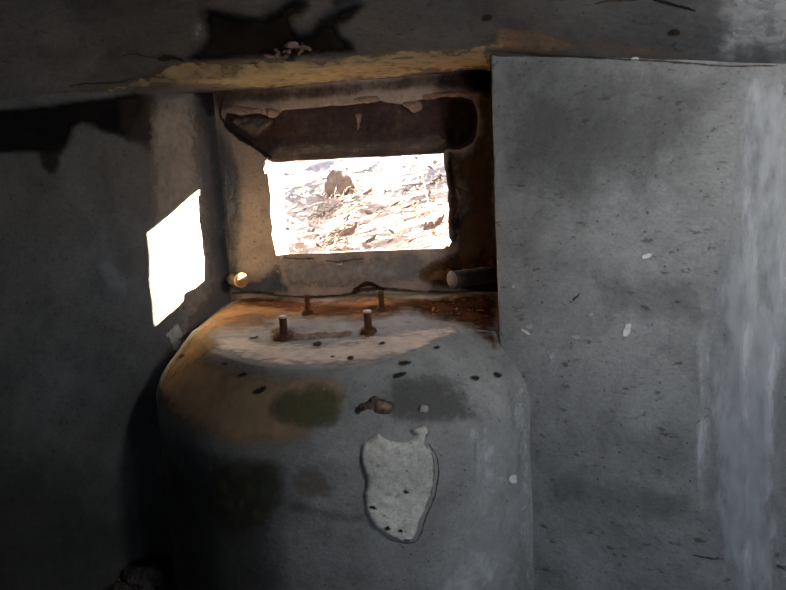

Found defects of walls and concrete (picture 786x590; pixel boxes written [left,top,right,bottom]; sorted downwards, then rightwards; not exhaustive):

crack [595,0,696,11]
spalling [264,41,312,59]
spalling [225,91,478,163]
corrosion [201,89,499,342]